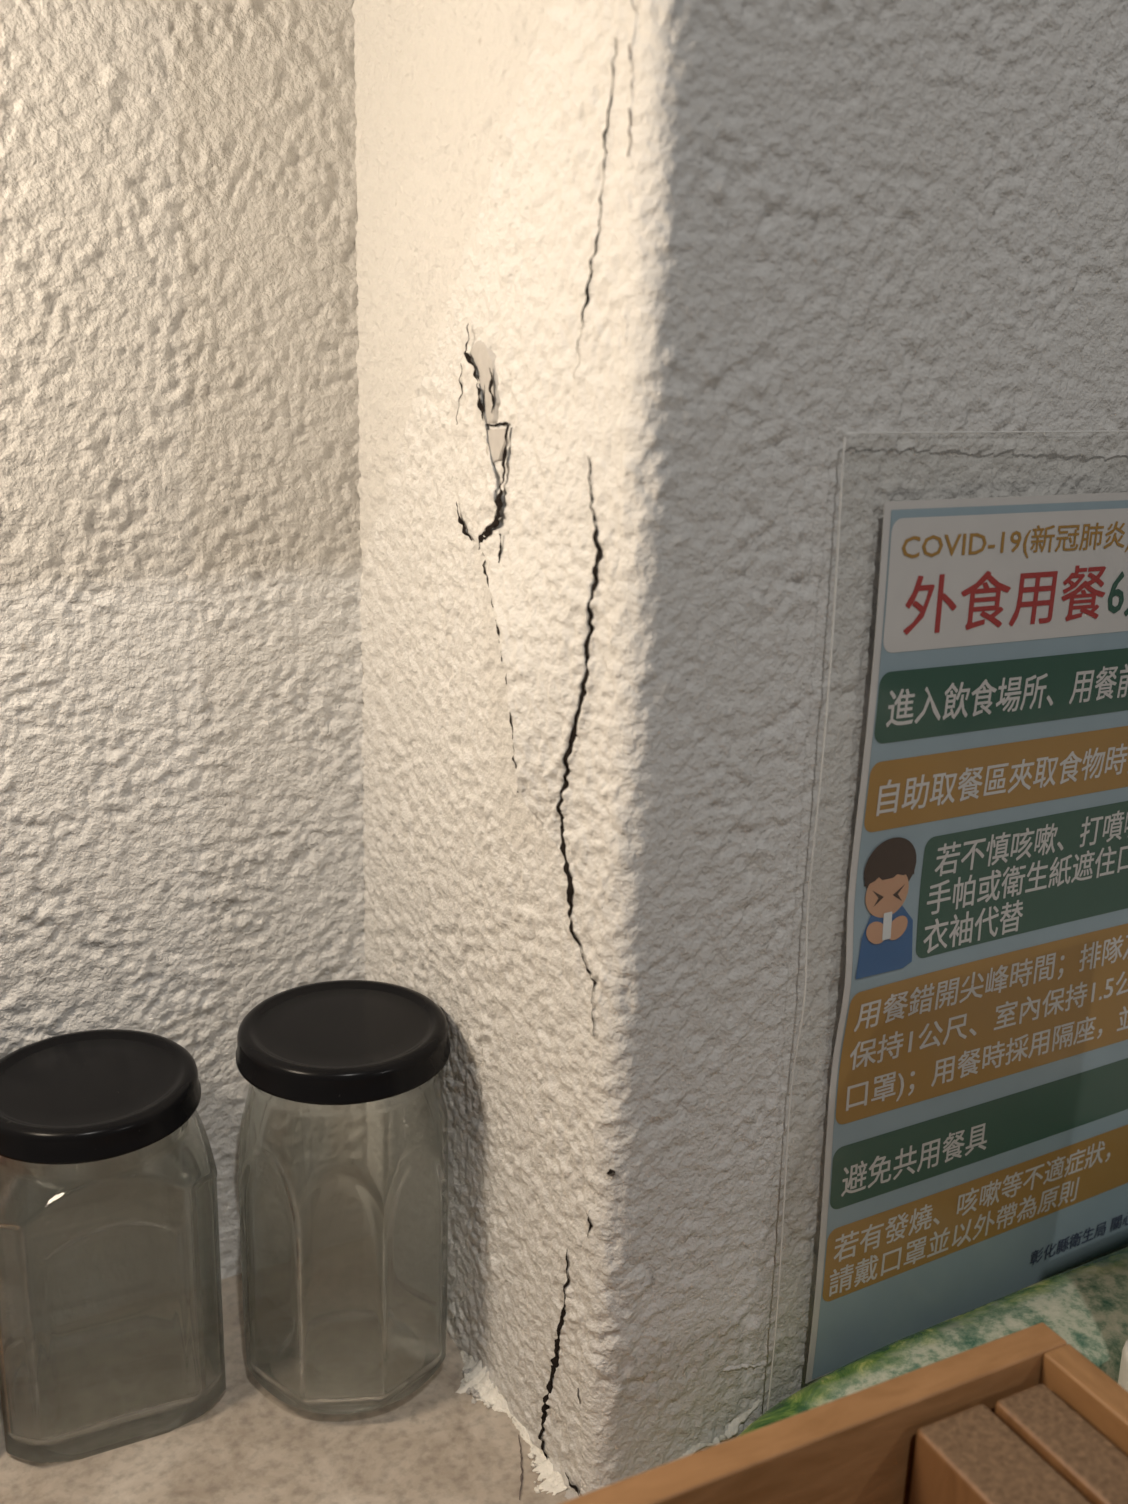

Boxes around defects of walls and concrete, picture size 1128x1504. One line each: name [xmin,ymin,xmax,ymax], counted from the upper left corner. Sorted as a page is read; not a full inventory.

peeling [456,323,510,549]
crack [556,456,605,1037]
flaking render [455,1350,577,1500]
crack [538,1213,592,1495]
flaking render [675,1399,762,1460]